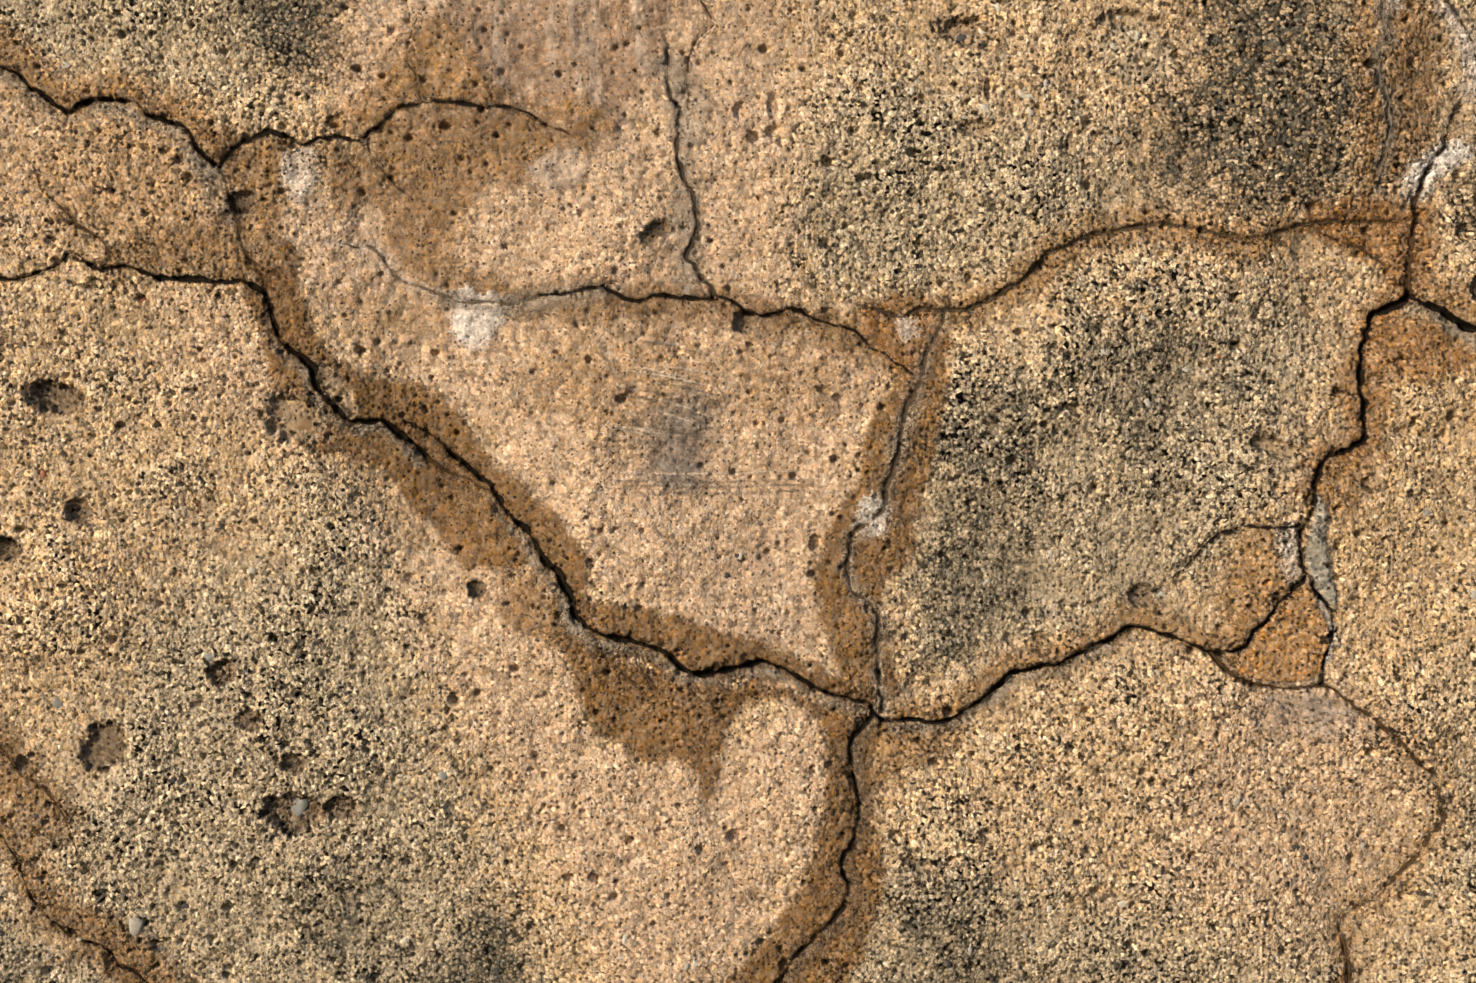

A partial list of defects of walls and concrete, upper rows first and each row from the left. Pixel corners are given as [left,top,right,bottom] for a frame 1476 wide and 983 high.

crack [0,63,569,241]
crack [316,0,913,375]
water stain [1125,0,1382,226]
water stain [1404,135,1476,232]
water stain [1437,2,1476,101]
crack [0,161,1090,884]
water stain [245,242,1049,983]
crack [844,220,1397,581]
water stain [1104,270,1202,463]
crack [1093,102,1476,909]
peeling [1234,497,1337,682]
crack [0,834,148,983]